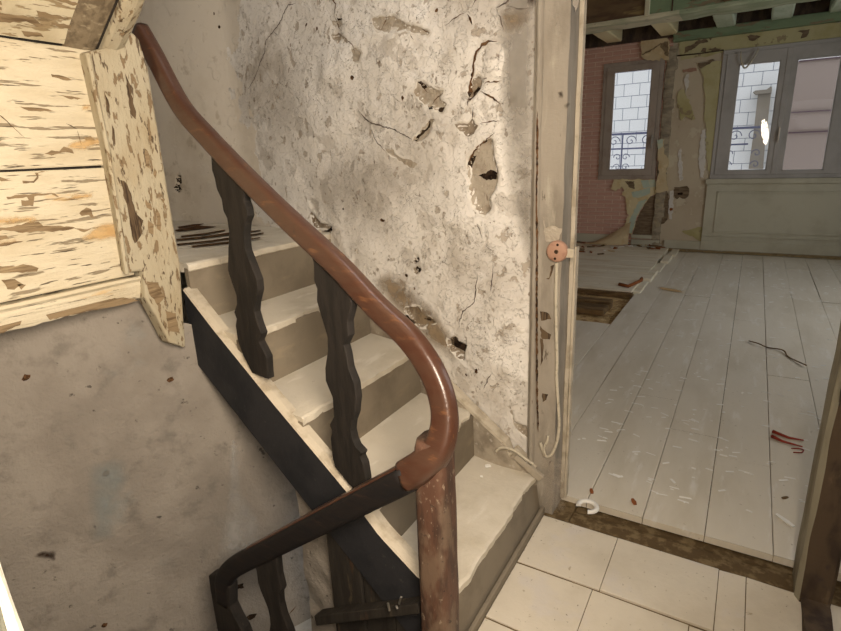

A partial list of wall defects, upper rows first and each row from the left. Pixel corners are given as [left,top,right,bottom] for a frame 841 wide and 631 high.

peeling [0,1,71,37]
crack [448,0,476,25]
crack [467,0,527,119]
peeling [125,74,136,119]
crack [358,110,411,151]
flaking render [412,79,448,143]
flaking render [454,112,502,219]
peeling [611,179,689,235]
peeling [0,221,91,246]
peeling [0,264,38,290]
peeling [46,297,139,320]
flaking render [447,335,468,361]